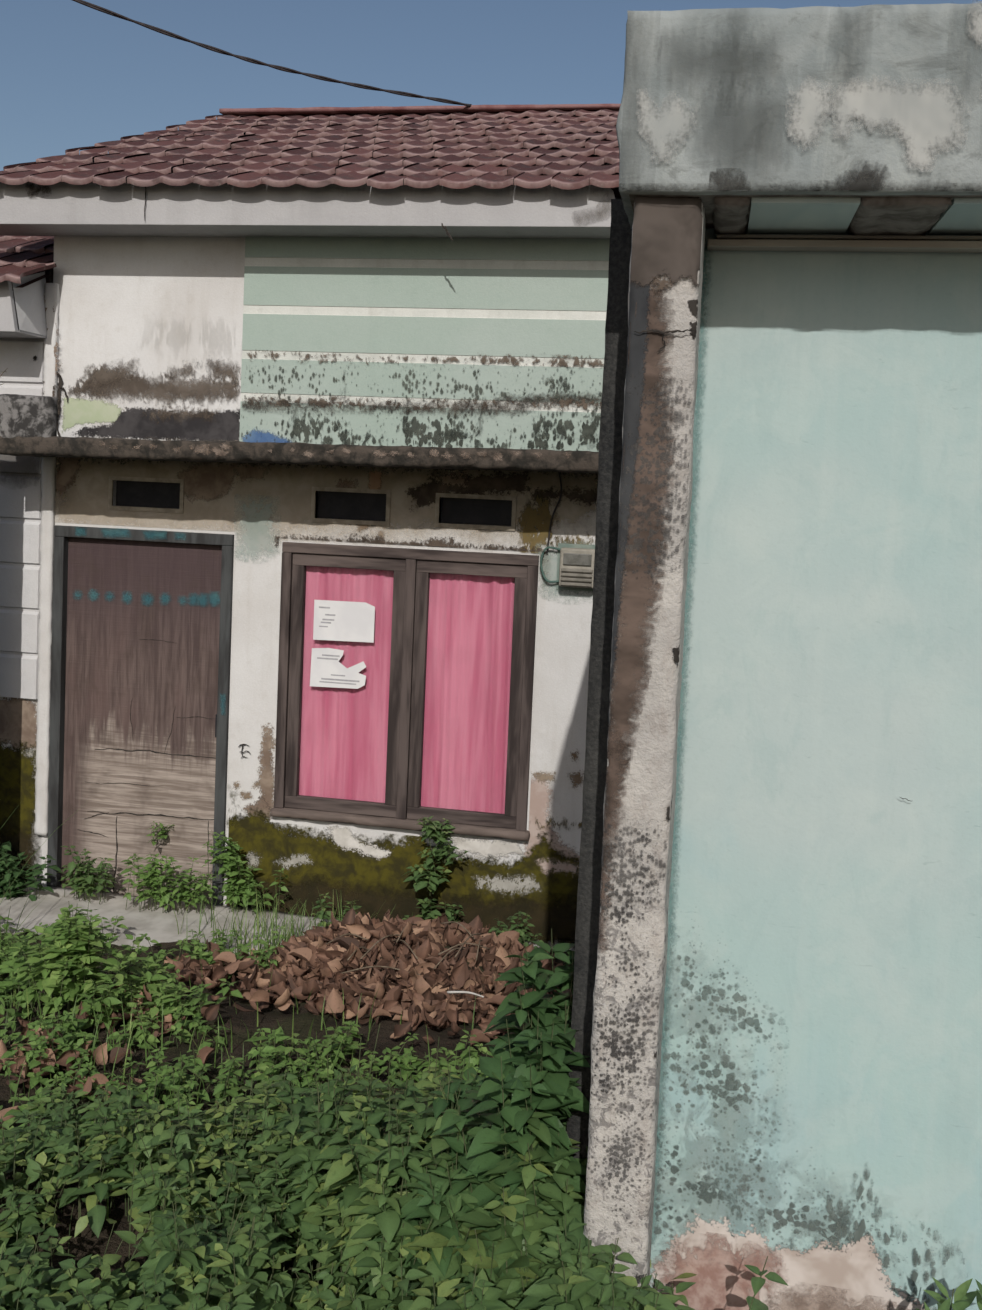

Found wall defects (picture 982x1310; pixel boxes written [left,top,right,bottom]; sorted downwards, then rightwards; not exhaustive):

peeling [788,78,970,172]
leakage [785,164,899,192]
peeling [43,295,604,441]
leakage [72,359,601,451]
leakage [0,454,39,480]
leakage [58,458,598,531]
peeling [0,697,38,757]
leakage [588,169,950,1310]
peeling [275,854,310,869]
peeling [328,825,391,861]
peeling [452,751,584,895]
peeling [651,1210,925,1310]